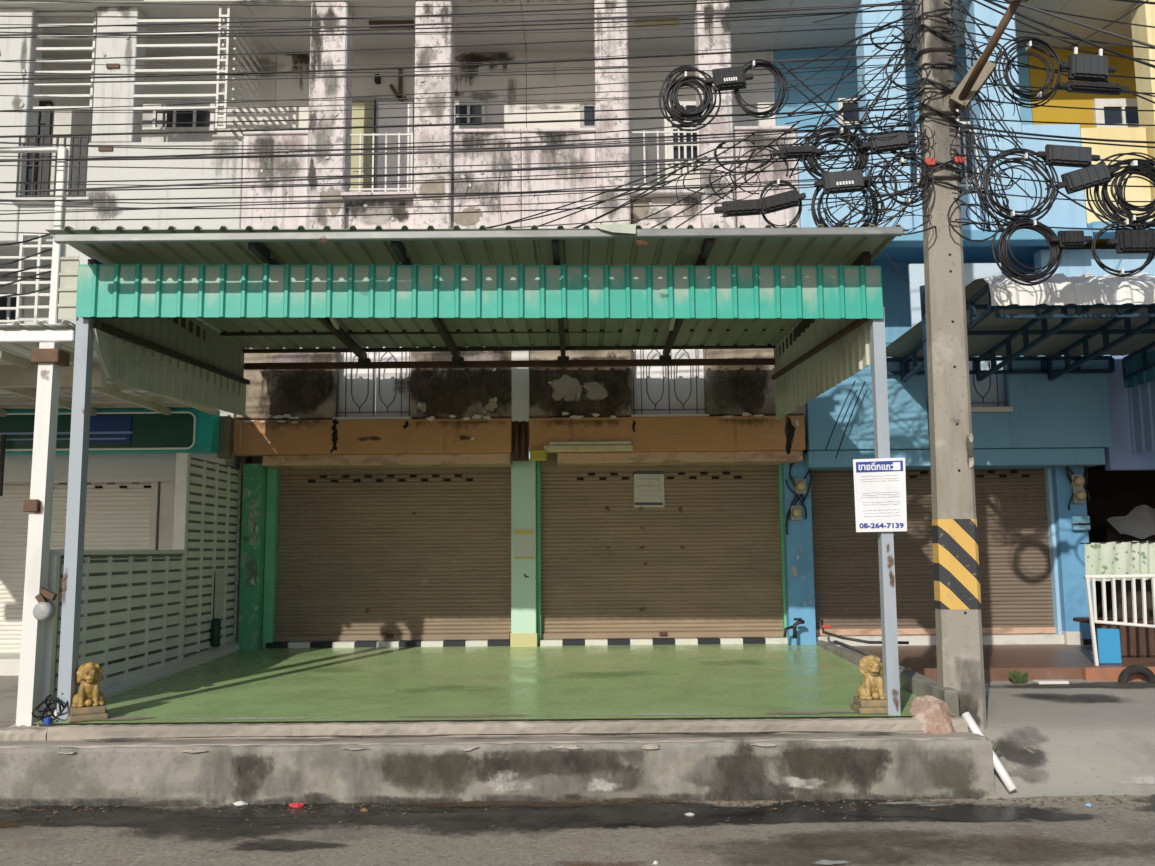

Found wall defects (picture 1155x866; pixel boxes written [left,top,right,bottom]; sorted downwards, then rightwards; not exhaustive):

water stain [459,128,509,175]
water stain [524,132,585,168]
water stain [260,353,334,425]
water stain [396,351,512,425]
water stain [529,353,632,425]
spalling [548,374,617,419]
water stain [716,358,768,424]
water stain [0,797,200,807]
water stain [343,734,984,804]